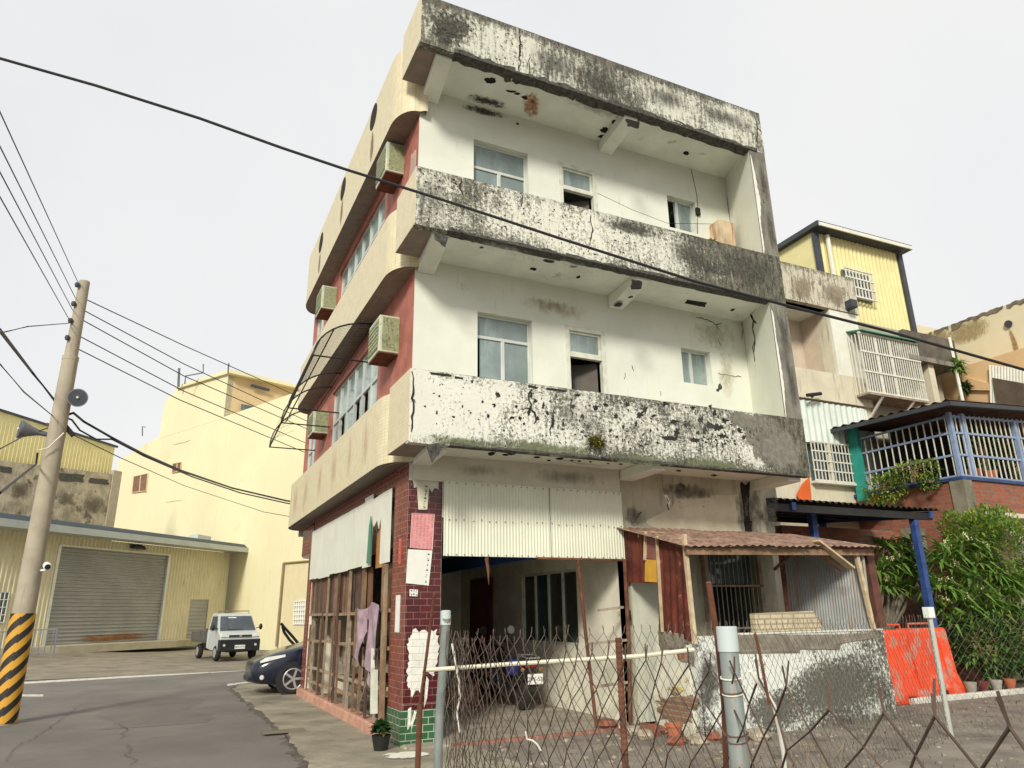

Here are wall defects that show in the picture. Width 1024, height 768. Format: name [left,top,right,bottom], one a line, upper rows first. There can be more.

leakage [430,13,474,44]
crack [518,29,530,73]
leakage [465,95,504,117]
corrosion [524,95,538,116]
leakage [709,109,741,126]
spalling [451,33,765,253]
leakage [606,221,656,238]
leakage [792,277,844,306]
crack [696,309,756,377]
crack [409,371,417,432]
crack [522,389,573,436]
spalling [424,372,802,532]